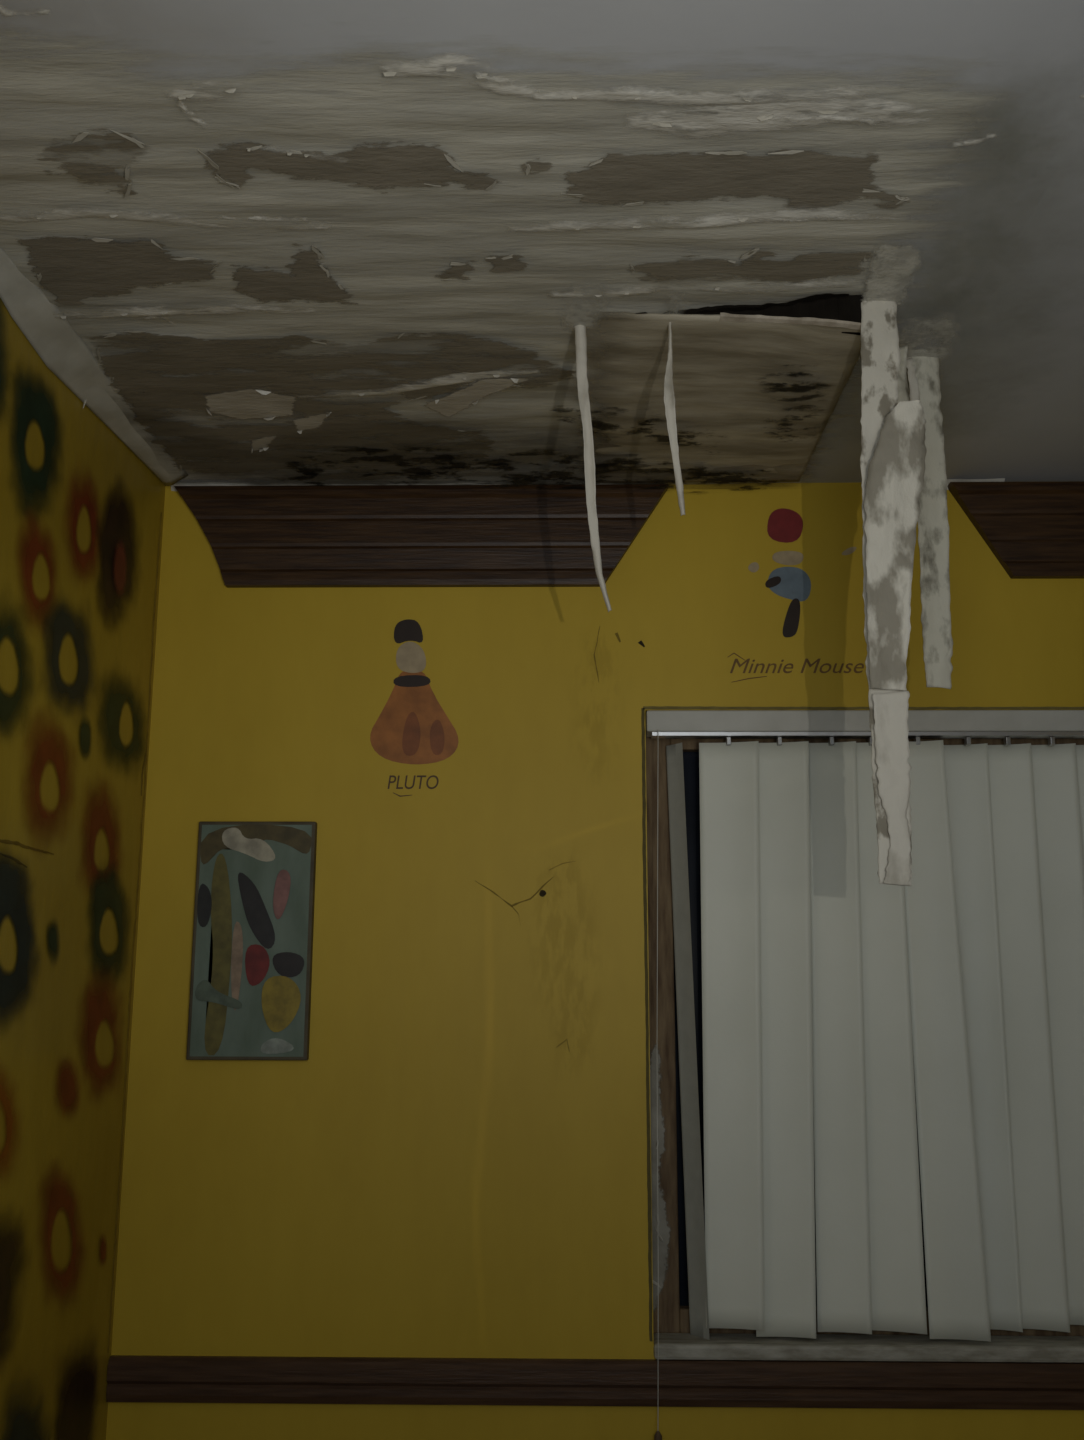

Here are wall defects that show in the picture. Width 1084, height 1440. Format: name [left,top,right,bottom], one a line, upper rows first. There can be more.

peeling [0,32,991,485]
leakage [762,365,831,441]
leakage [287,406,776,493]